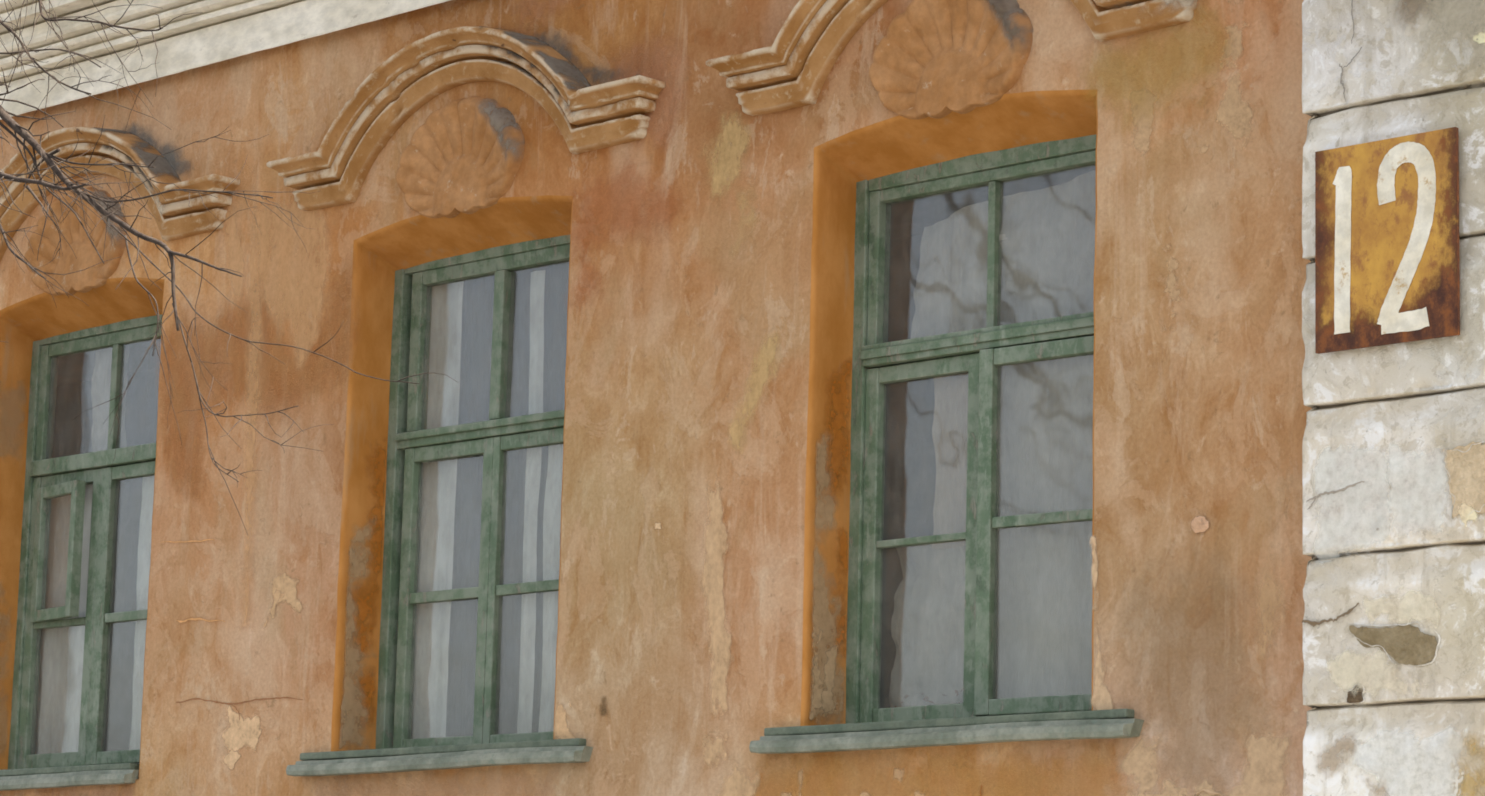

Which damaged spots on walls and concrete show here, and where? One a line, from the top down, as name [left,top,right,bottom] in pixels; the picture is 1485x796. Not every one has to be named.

crack [1306,481,1364,509]
peeling [1315,441,1485,562]
peeling [264,573,302,626]
peeling [810,631,838,720]
flaking render [1349,621,1441,666]
peeling [222,705,261,770]
peeling [1122,736,1288,796]
peeling [1353,729,1464,796]